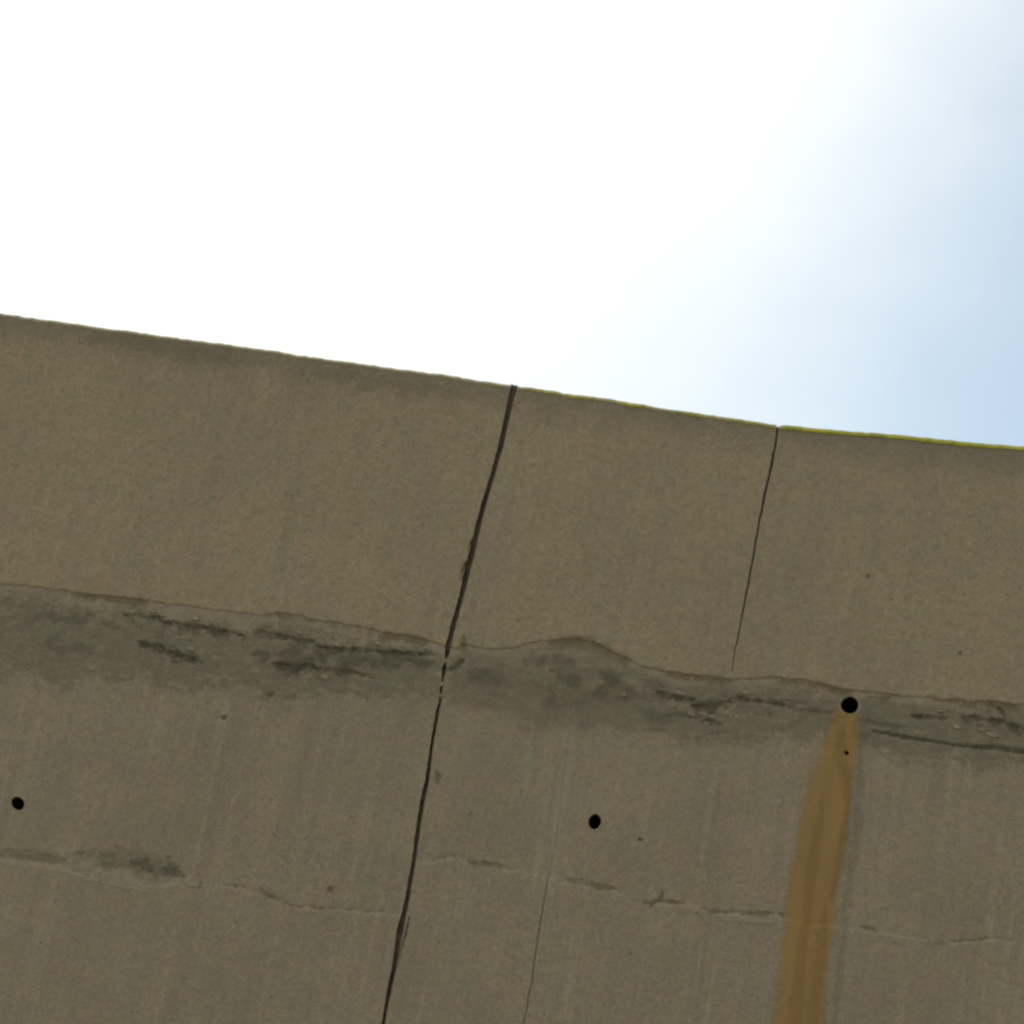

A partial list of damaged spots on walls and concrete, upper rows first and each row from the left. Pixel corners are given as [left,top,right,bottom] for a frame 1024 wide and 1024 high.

crack [382,383,518,1024]
crack [732,428,779,671]
rust [776,710,857,1024]